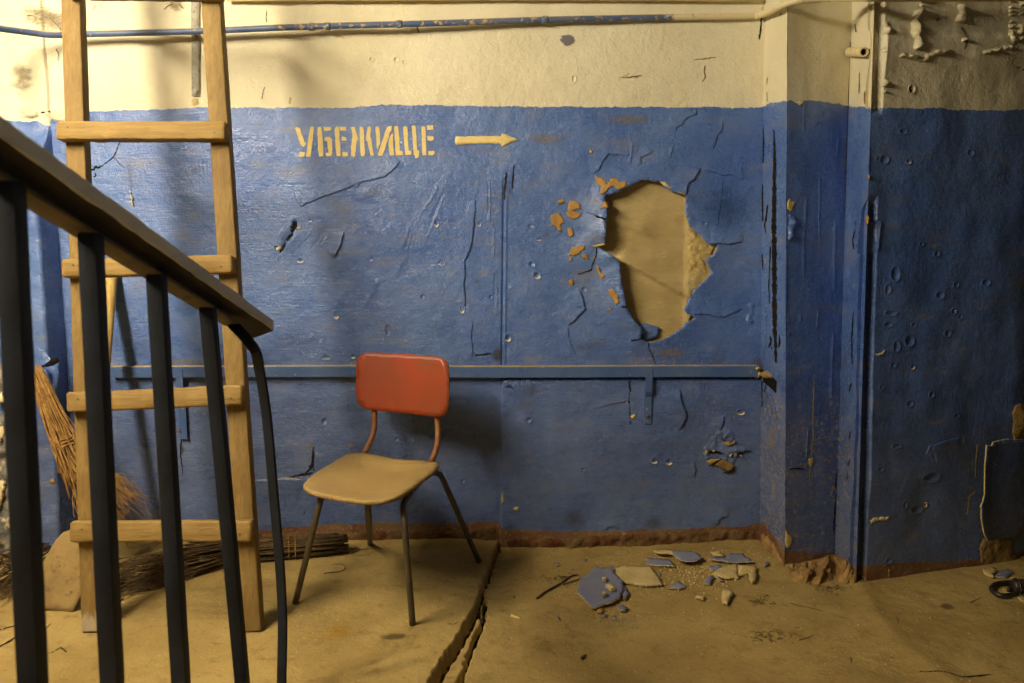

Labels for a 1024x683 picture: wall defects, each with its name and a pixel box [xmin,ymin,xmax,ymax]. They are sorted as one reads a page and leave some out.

spalling [899,48,955,62]
crack [504,165,515,200]
peeling [551,163,744,356]
spalling [704,430,752,474]
peeling [979,403,1024,578]
spalling [342,516,862,587]
crack [439,552,499,683]